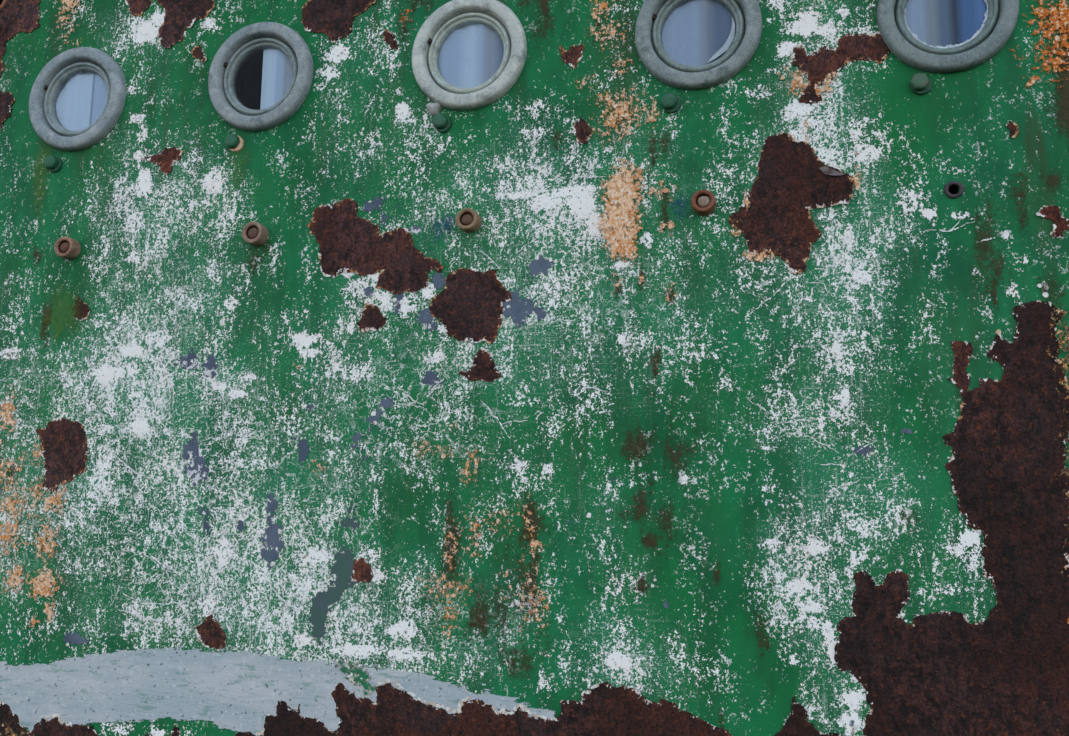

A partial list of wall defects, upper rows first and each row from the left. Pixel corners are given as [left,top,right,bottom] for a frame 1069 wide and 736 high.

rust [125,0,215,49]
rust [554,0,677,294]
rust [728,31,892,275]
rust [1012,0,1069,138]
rust [308,198,512,382]
rust [0,384,88,627]
rust [0,700,98,736]
peeling [0,511,555,736]
rust [235,681,732,736]
rust [417,493,553,678]
peeling [584,564,678,695]
rust [834,278,1069,736]